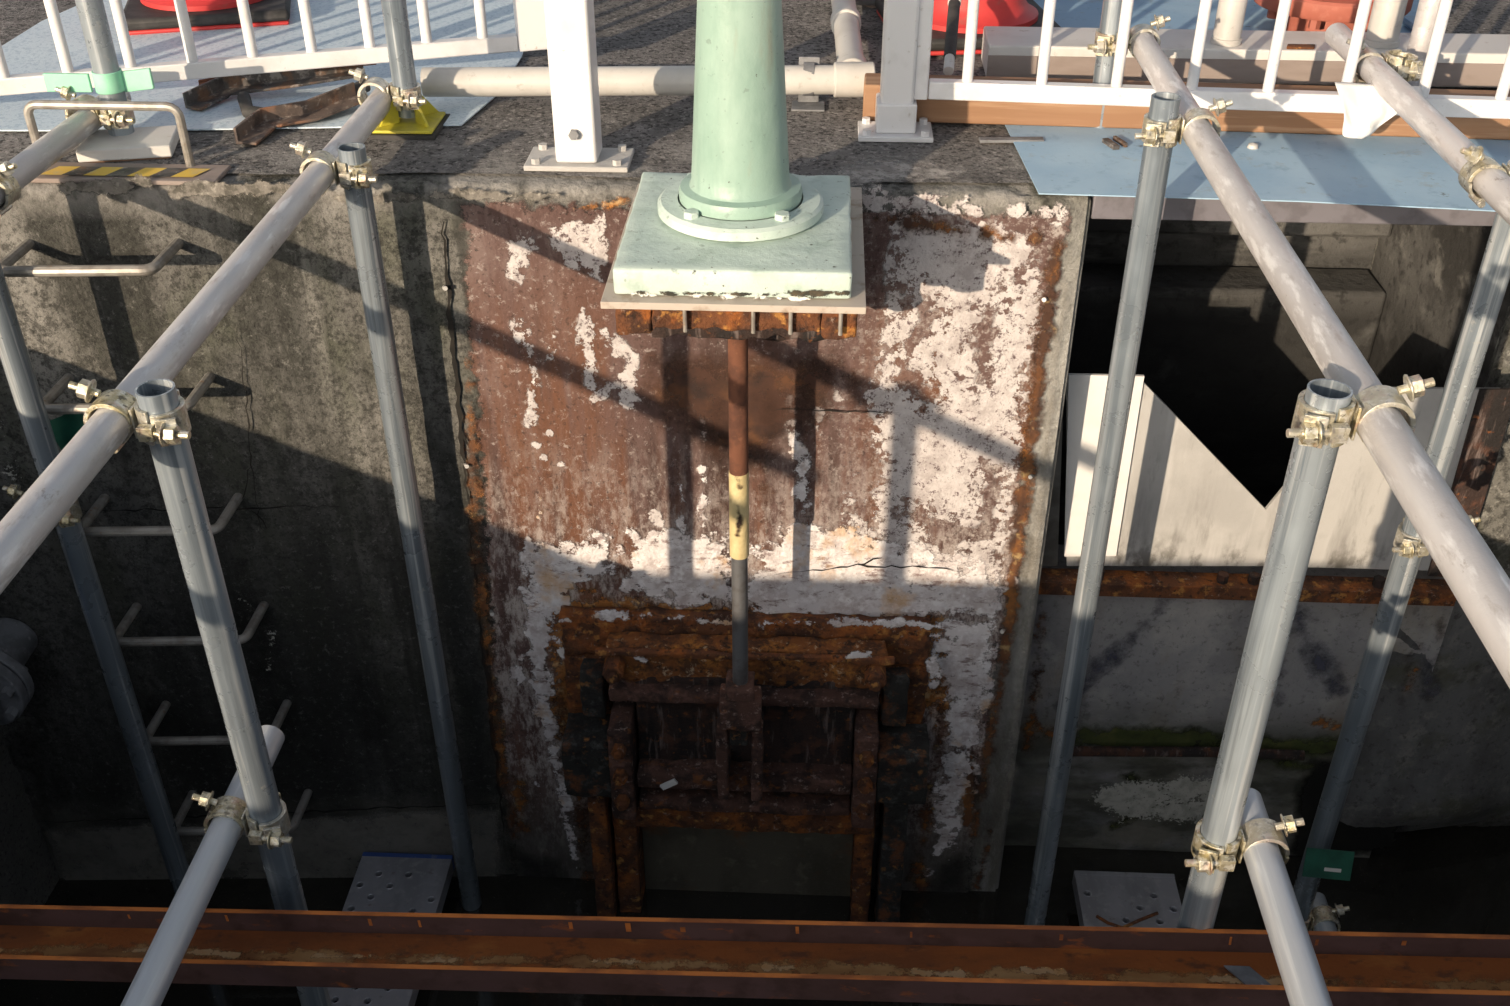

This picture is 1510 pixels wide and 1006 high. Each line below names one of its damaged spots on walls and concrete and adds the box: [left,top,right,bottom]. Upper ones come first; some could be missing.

damp [838,160,984,218]
damp [1006,202,1068,227]
rust [544,588,770,741]
damp [509,406,1033,895]
damp [49,826,169,880]
damp [180,835,204,866]
damp [220,835,266,879]
damp [289,813,457,878]